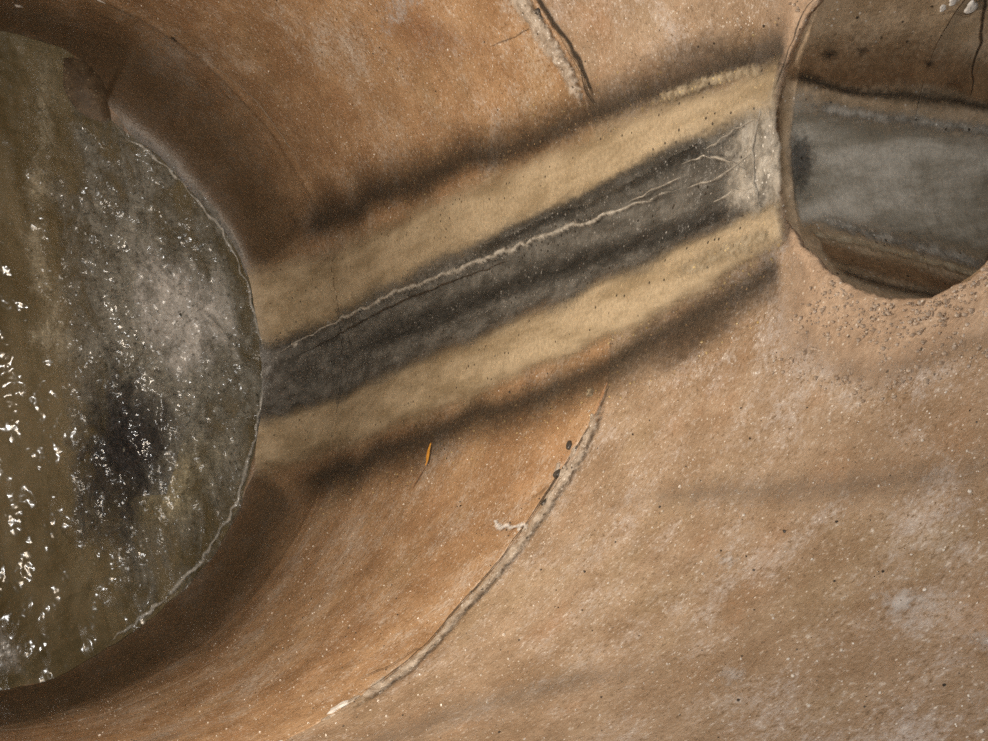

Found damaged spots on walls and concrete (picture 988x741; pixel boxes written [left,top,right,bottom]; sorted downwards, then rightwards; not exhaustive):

crack [493,0,593,100]
crack [949,0,987,93]